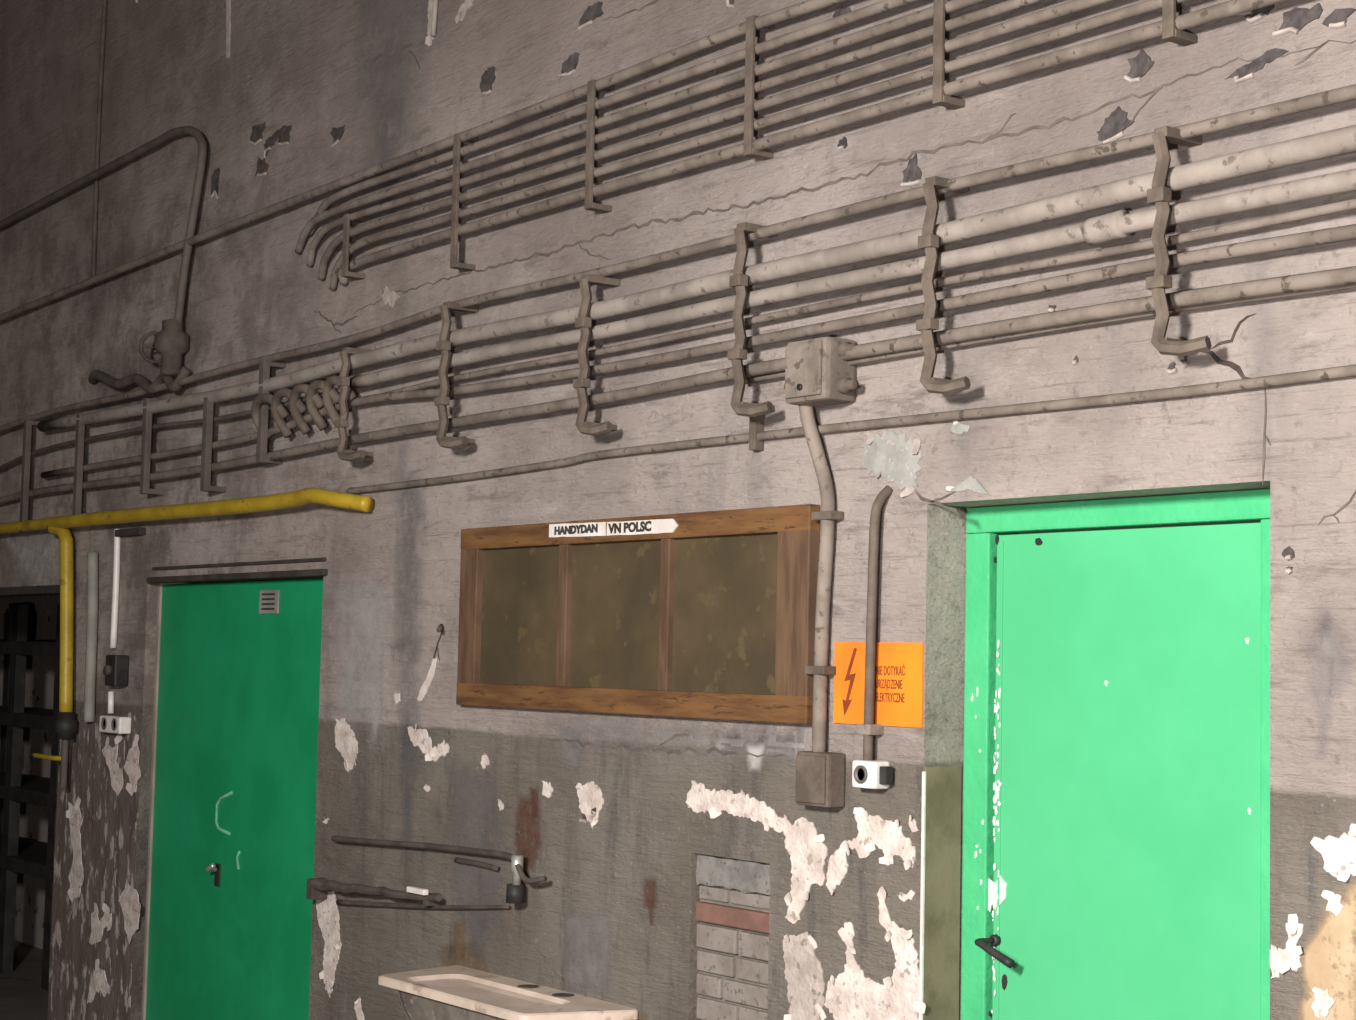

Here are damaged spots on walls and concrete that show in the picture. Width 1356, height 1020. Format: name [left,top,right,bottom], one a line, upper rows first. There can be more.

crack [601,0,659,21]
spalling [1224,3,1356,84]
crack [313,40,1356,334]
crack [1202,313,1271,485]
peeling [86,878,141,1004]
peeling [102,734,141,795]
peeling [407,724,450,762]
rust [517,789,539,875]
peeling [575,781,604,829]
peeling [686,781,926,1020]
peeling [1270,914,1304,979]
peeling [1310,824,1356,916]